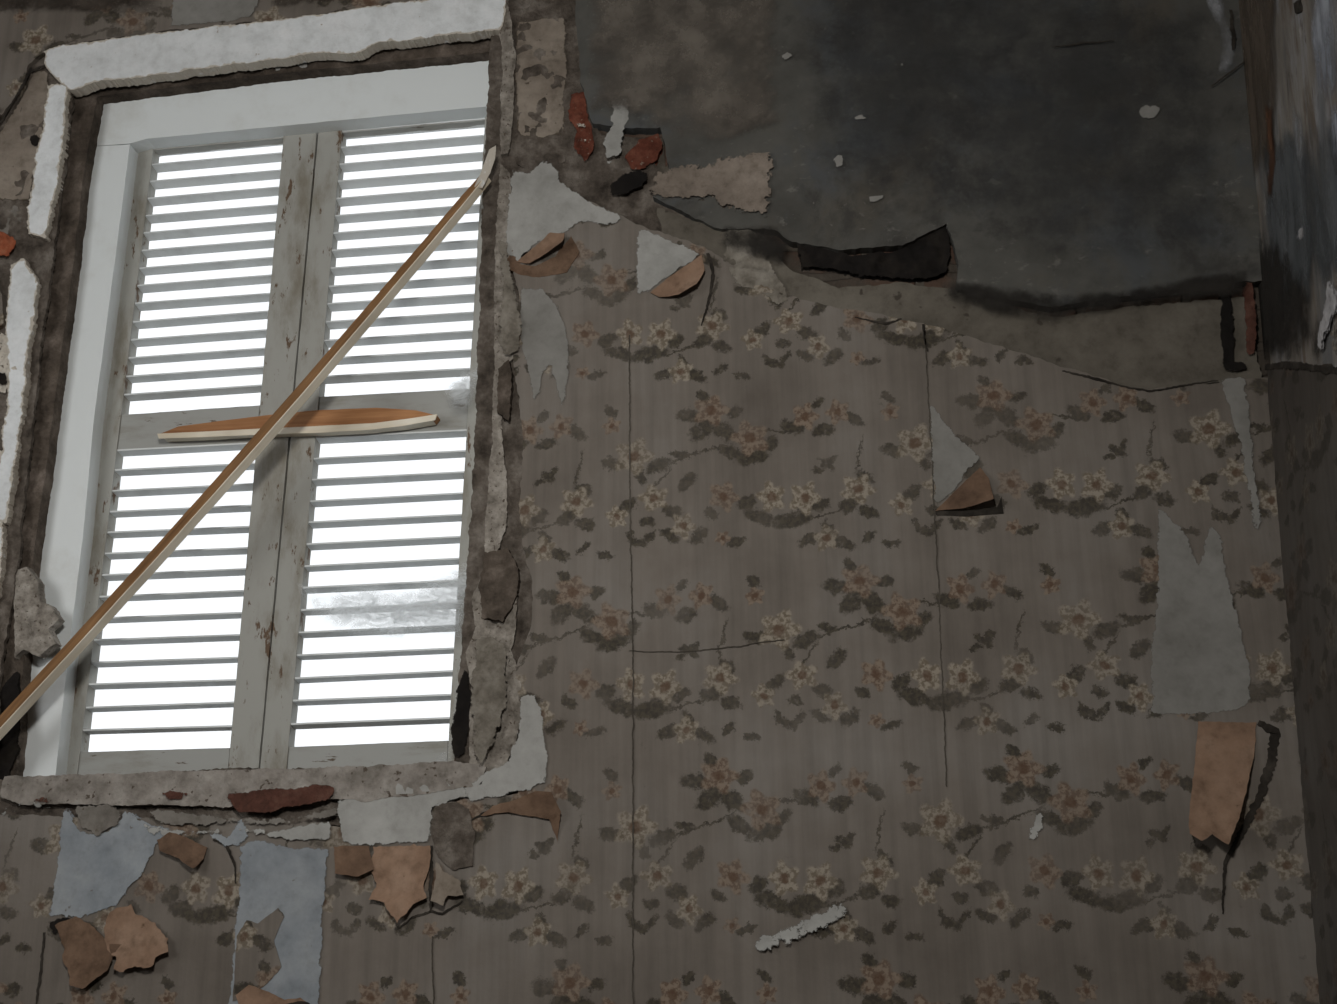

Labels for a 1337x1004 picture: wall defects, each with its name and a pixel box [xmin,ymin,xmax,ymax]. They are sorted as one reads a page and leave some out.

crack [0,65,45,124]
flaking render [513,0,774,218]
flaking render [0,70,49,256]
spalling [723,229,788,306]
spalling [797,226,950,283]
spalling [1218,282,1257,372]
peeling [1317,281,1337,351]
spalling [0,333,17,393]
spalling [0,567,65,714]
spalling [0,720,21,780]
flaking render [150,784,337,826]
spalling [431,802,476,870]